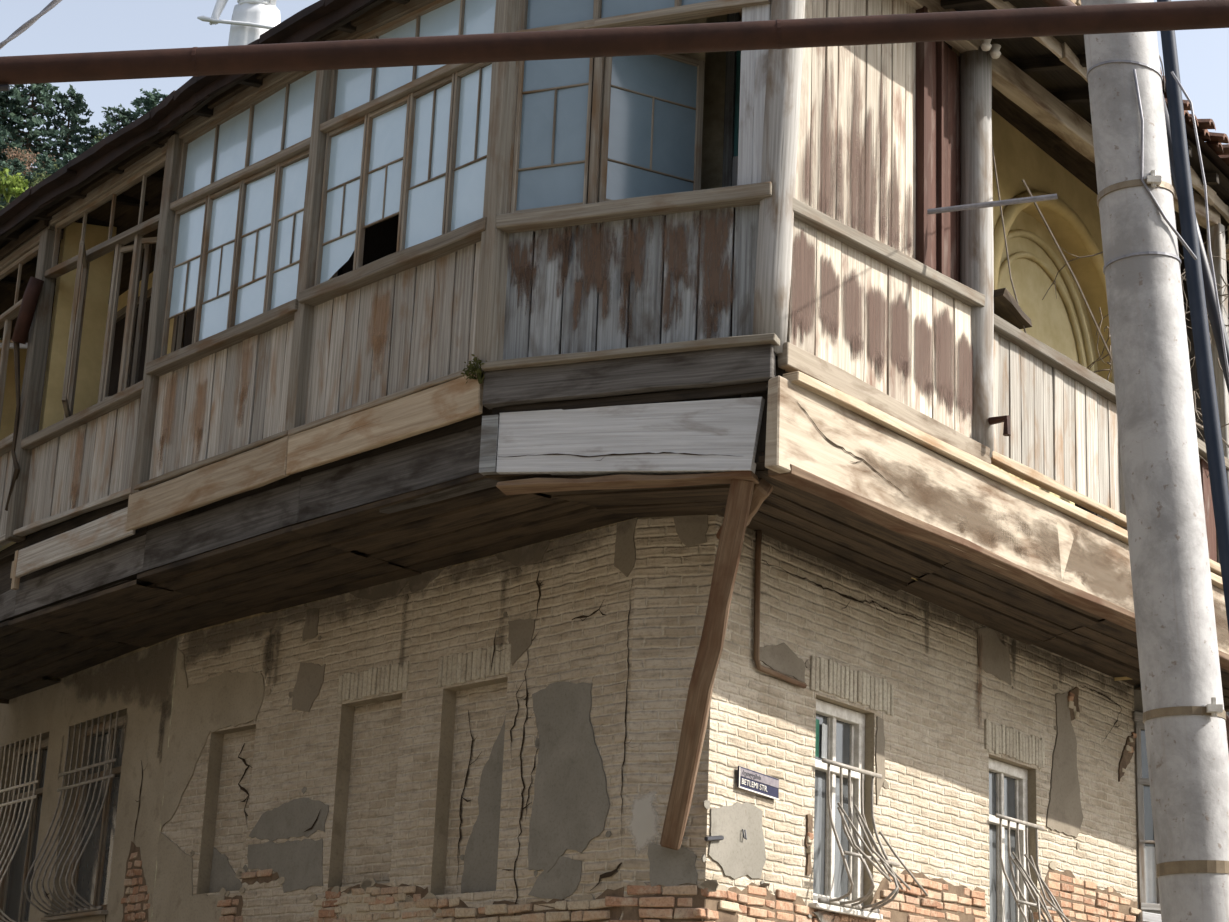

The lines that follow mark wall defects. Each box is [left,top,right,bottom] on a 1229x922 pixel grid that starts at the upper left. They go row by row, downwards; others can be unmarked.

crack [238,743,252,824]
crack [457,710,481,877]
crack [491,570,544,916]
crack [572,578,637,891]
spalling [1068,687,1080,721]
flaking render [121,841,153,922]
flaking render [217,864,285,922]
flaking render [309,878,819,922]
flaking render [839,869,987,922]
flaking render [1033,861,1142,922]